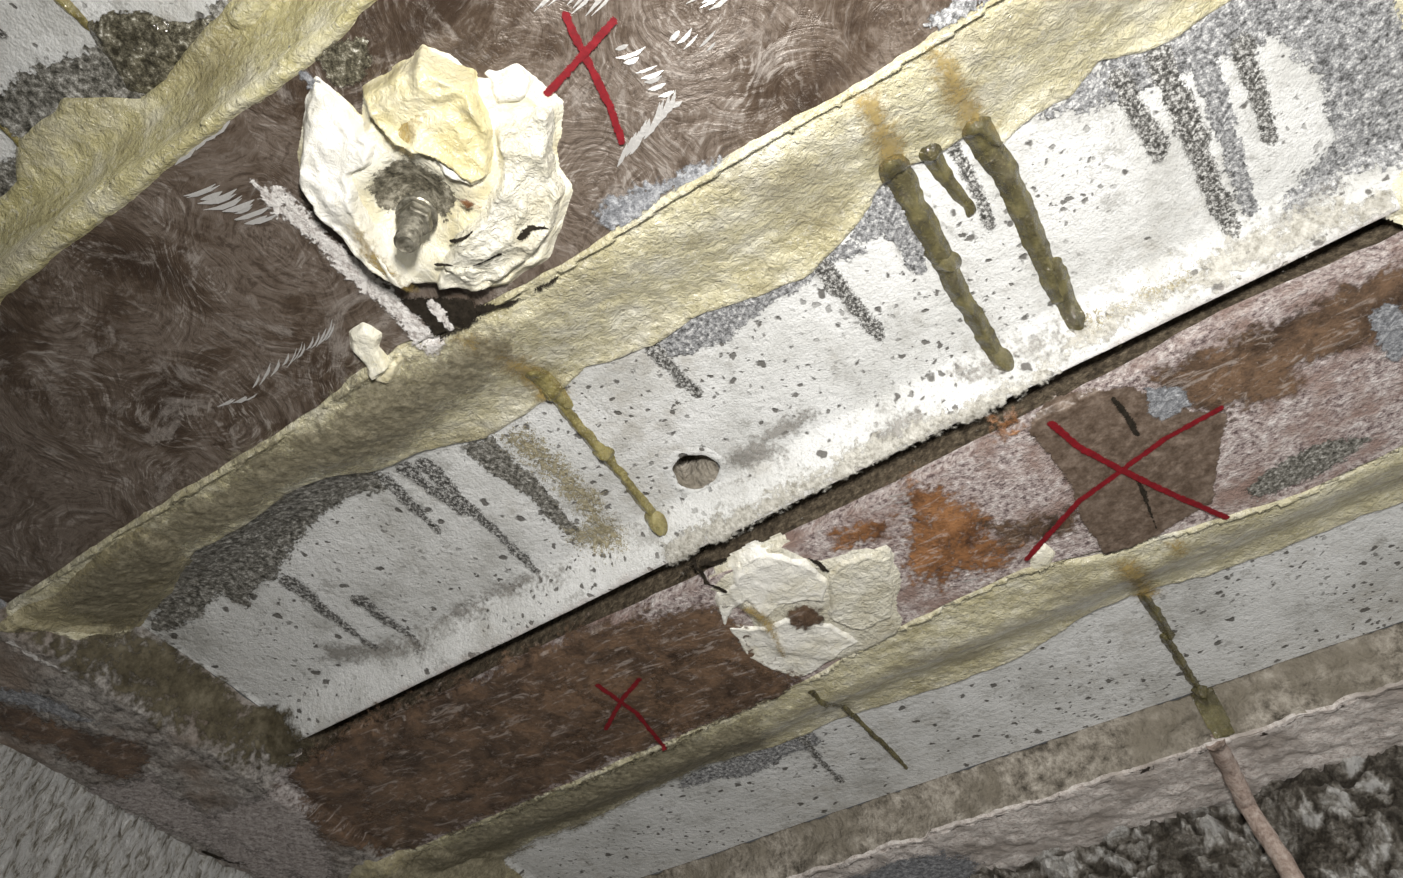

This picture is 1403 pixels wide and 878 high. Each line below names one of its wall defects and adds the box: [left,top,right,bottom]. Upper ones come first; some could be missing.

corrosion [988,407,1027,441]
corrosion [827,475,1081,592]
corrosion [787,605,824,630]